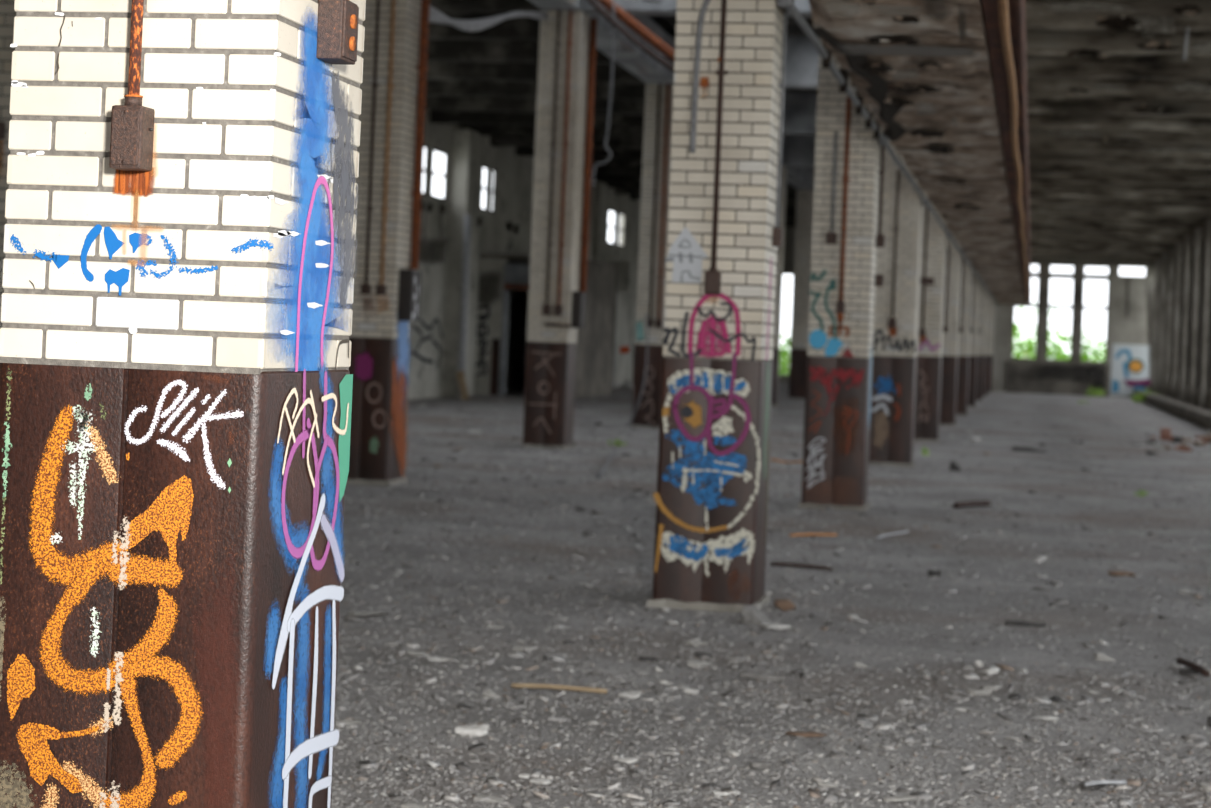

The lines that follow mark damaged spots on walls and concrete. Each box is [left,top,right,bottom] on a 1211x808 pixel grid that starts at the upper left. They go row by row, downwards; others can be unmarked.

leakage [1045,101,1101,122]
corrosion [114,168,154,197]
corrosion [0,759,38,808]